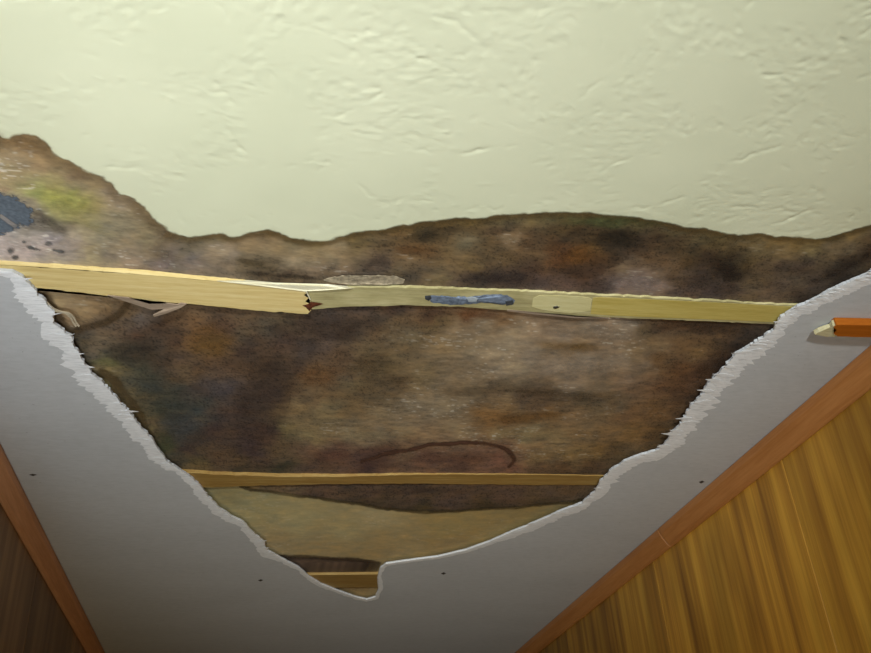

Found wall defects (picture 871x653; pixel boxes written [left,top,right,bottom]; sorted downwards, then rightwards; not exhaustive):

damp [0,134,871,304]
peeling [47,334,100,382]
peeling [691,365,735,404]
damp [38,291,774,573]
peeling [638,417,692,460]